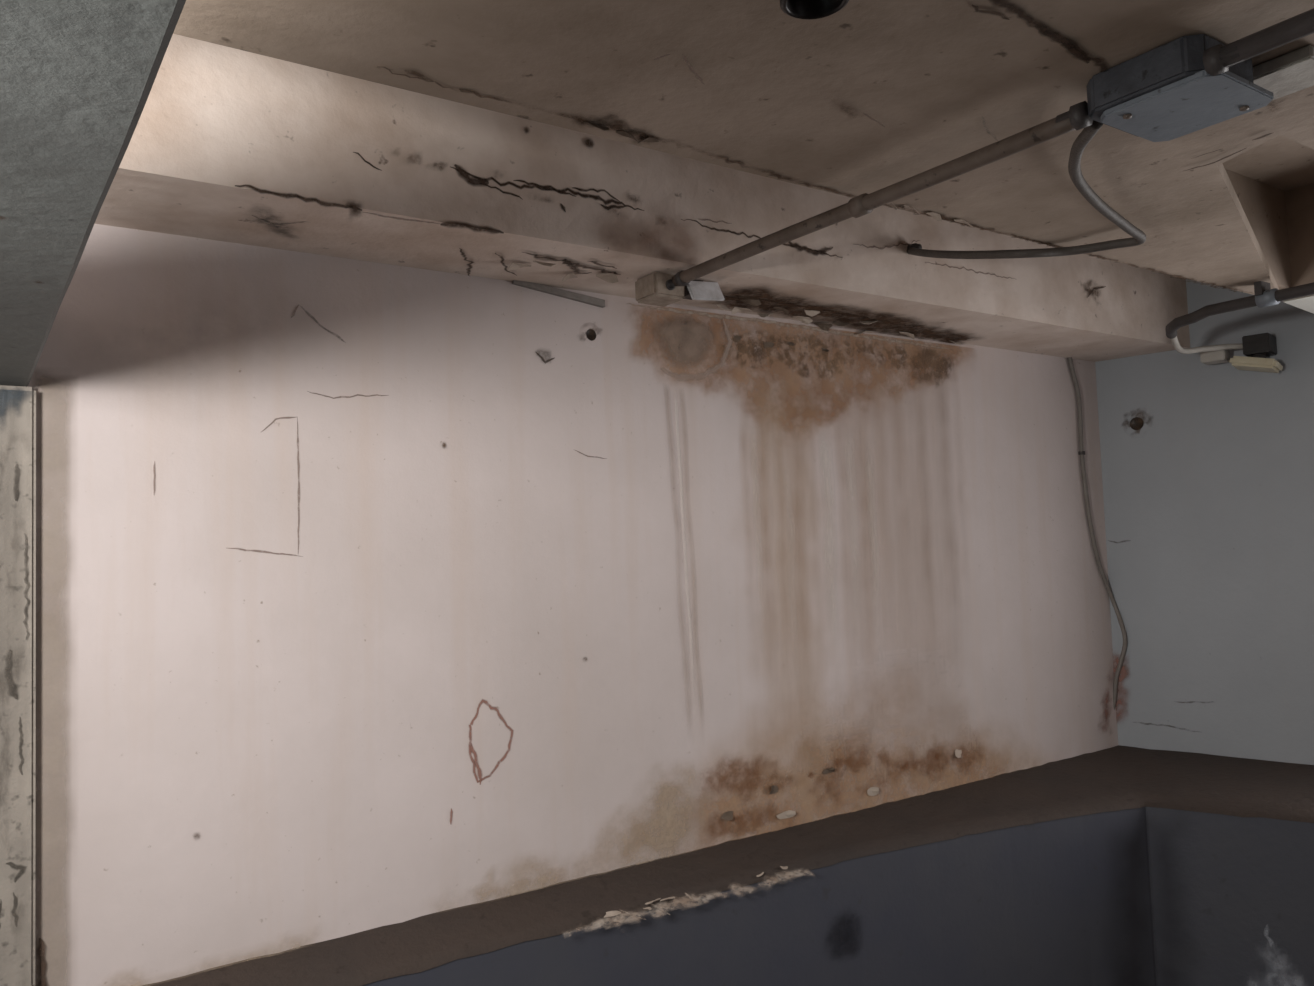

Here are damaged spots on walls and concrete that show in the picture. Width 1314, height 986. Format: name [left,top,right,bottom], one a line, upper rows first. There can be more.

crack [972,0,1108,72]
crack [434,164,644,212]
crack [235,185,621,283]
crack [681,219,1015,279]
spalling [627,289,971,377]
damp [639,307,961,430]
peeling [577,866,812,930]